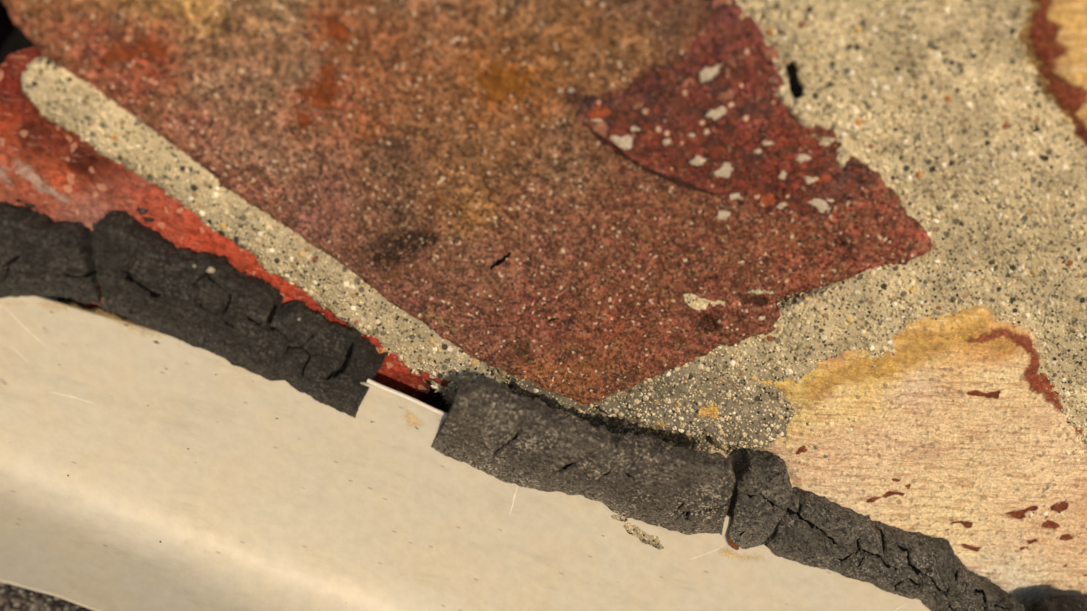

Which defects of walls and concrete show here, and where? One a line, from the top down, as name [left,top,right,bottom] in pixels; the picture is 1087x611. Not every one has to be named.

spalling [557,0,880,221]
crack [2,255,20,281]
crack [60,268,354,380]
spalling [745,288,775,320]
crack [476,429,521,453]
crack [746,472,1007,611]